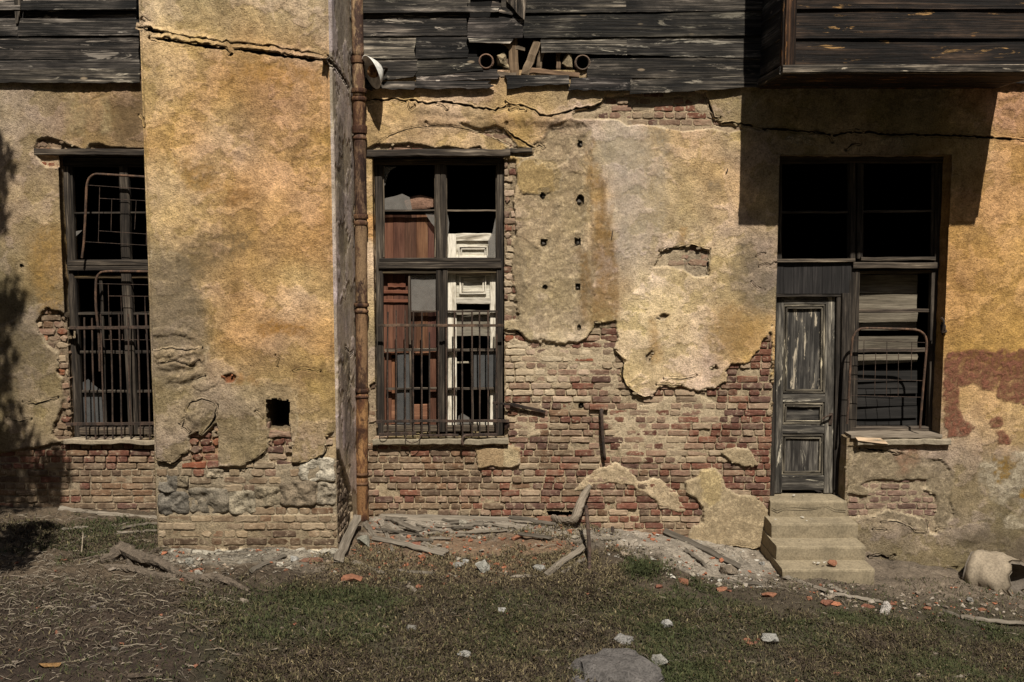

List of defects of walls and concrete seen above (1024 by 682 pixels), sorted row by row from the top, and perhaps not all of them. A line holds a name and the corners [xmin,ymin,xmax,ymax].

crack [135,17,605,155]
crack [704,93,1024,150]
spalling [368,91,773,537]
spalling [0,308,352,555]
peeling [844,445,955,531]